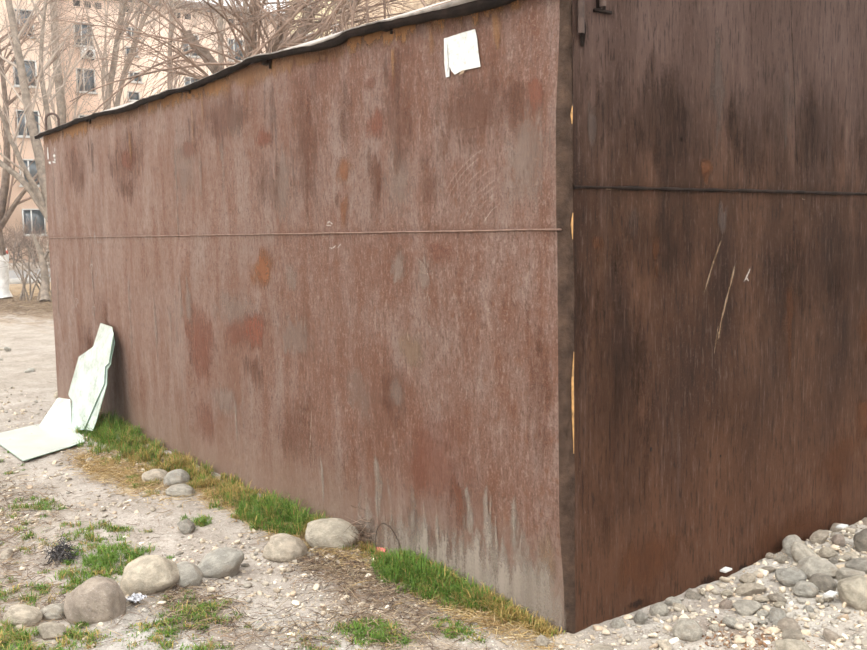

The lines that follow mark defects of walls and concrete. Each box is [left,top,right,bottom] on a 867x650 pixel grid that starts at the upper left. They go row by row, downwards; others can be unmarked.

corrosion [346,0,520,69]
corrosion [147,75,229,119]
corrosion [44,114,114,145]
corrosion [450,475,468,534]
damp [361,462,563,632]